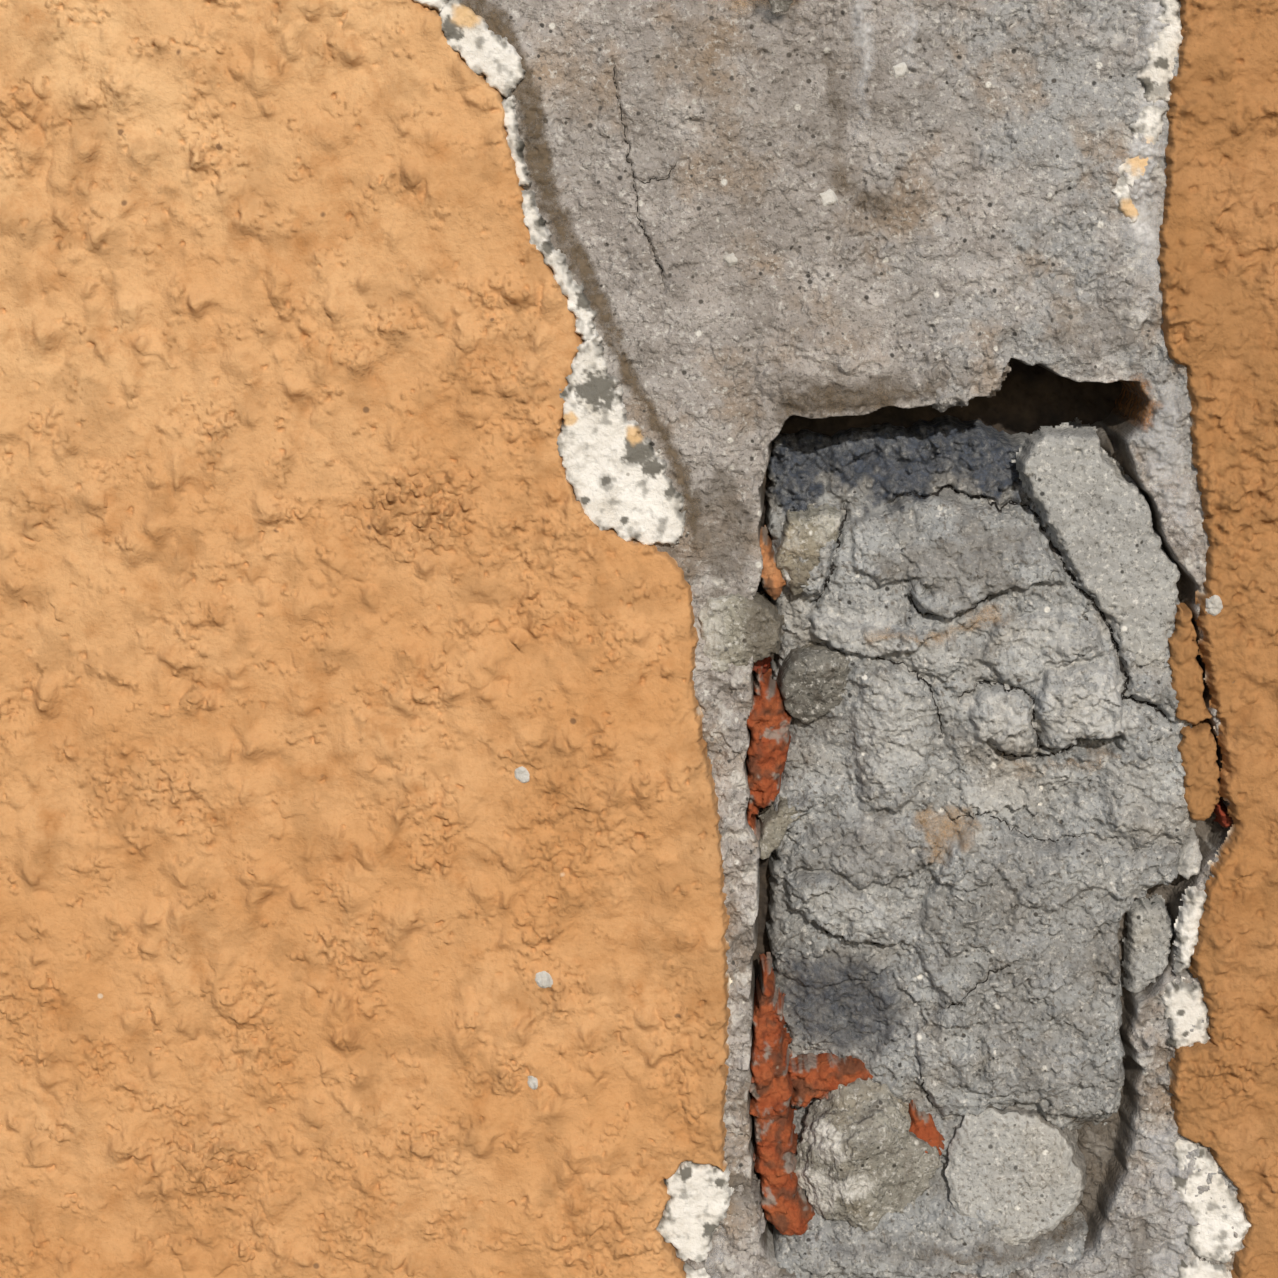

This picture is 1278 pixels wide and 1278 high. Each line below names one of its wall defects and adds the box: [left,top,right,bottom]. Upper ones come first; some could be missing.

crack [613,63,677,286]
spalling [413,0,1252,1278]